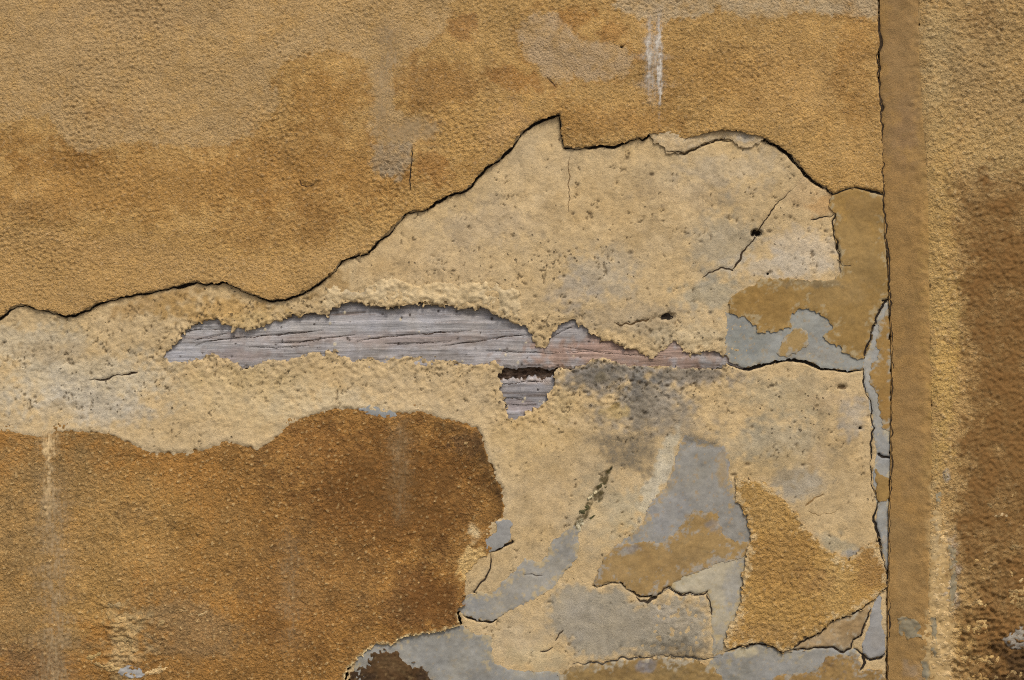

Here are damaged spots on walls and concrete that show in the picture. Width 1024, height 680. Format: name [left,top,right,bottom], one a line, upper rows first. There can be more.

flaking render [0,113,891,680]
water stain [646,24,662,104]
crack [573,5,894,680]